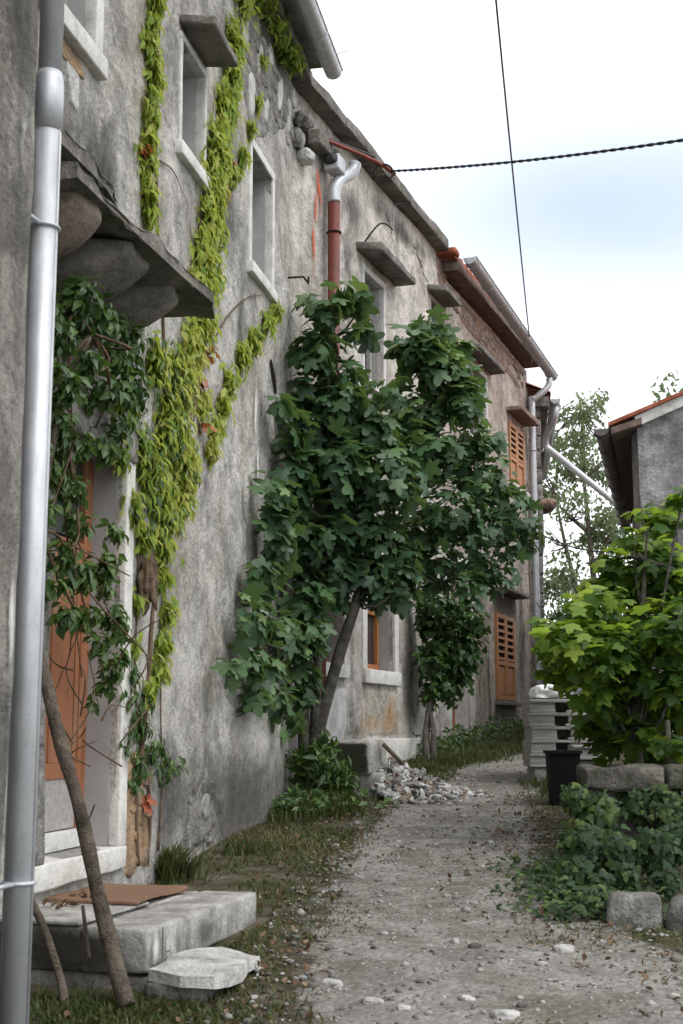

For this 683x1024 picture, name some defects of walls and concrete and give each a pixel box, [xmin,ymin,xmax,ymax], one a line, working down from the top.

flaking render [234,2,336,166]
rust [312,173,321,257]
spalling [436,259,524,388]